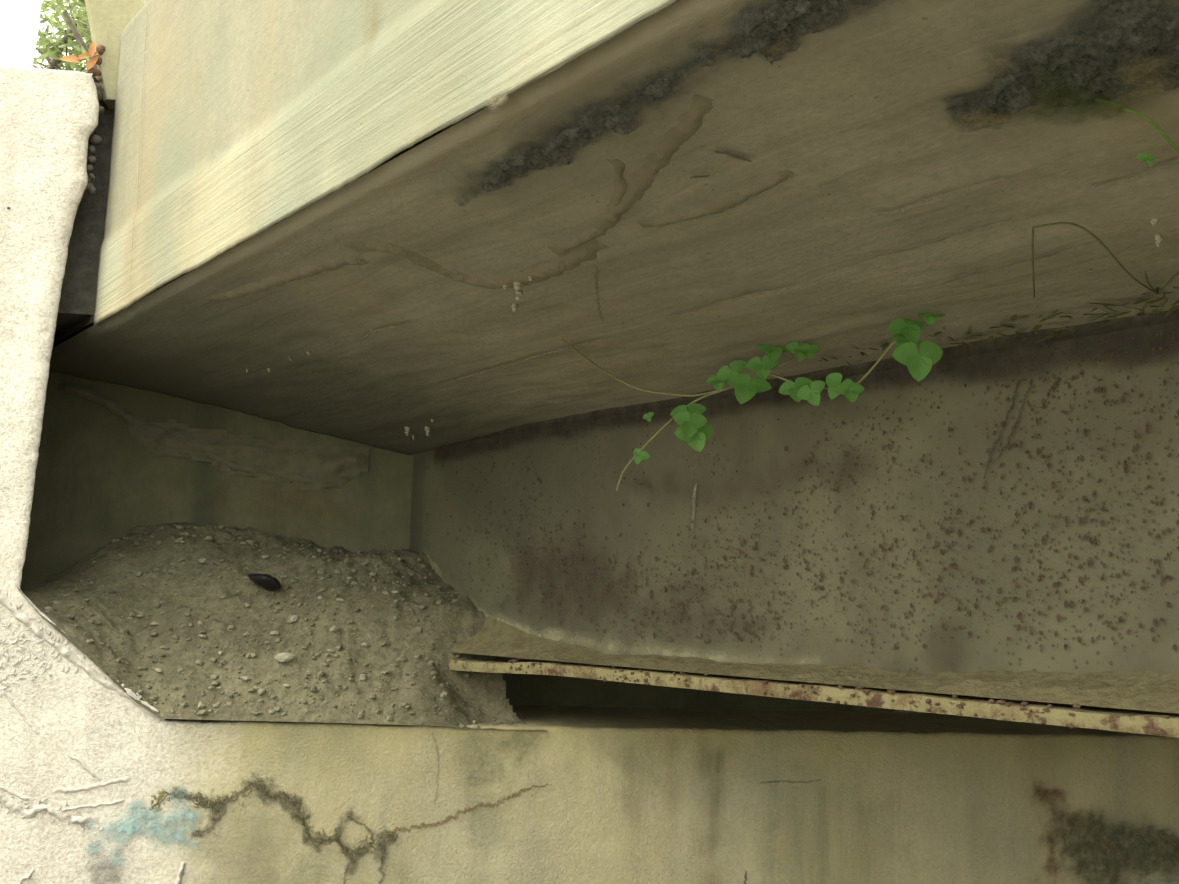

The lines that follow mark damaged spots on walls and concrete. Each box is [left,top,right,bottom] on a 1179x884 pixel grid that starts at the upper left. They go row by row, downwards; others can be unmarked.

spalling [482,0,868,192]
spalling [947,0,1179,132]
corrosion [423,330,1179,651]
crack [141,777,551,884]